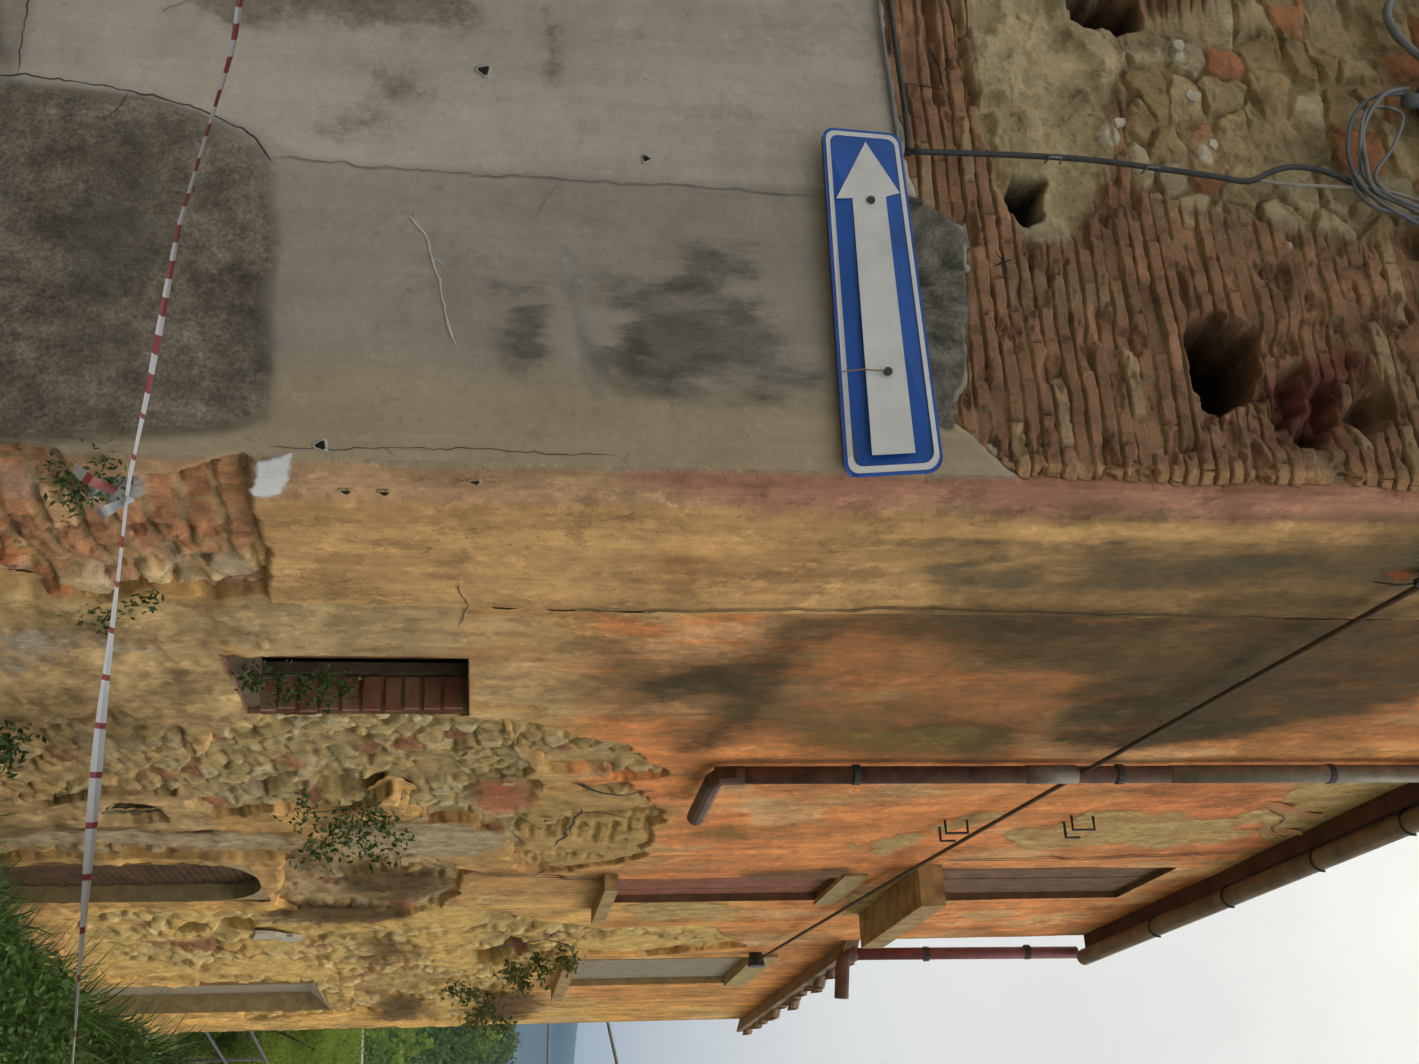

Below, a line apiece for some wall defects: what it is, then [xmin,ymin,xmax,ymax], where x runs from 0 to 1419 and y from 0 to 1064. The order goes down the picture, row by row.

crack [0,0,814,219]
damp [0,84,275,440]
crack [408,215,457,345]
damp [602,250,774,397]
flaking render [881,0,1419,492]
flaking render [0,441,268,597]
crack [457,586,1419,624]
damp [591,540,1419,759]
flaking render [0,707,663,867]
crack [462,782,656,880]
flaking render [0,830,744,1019]